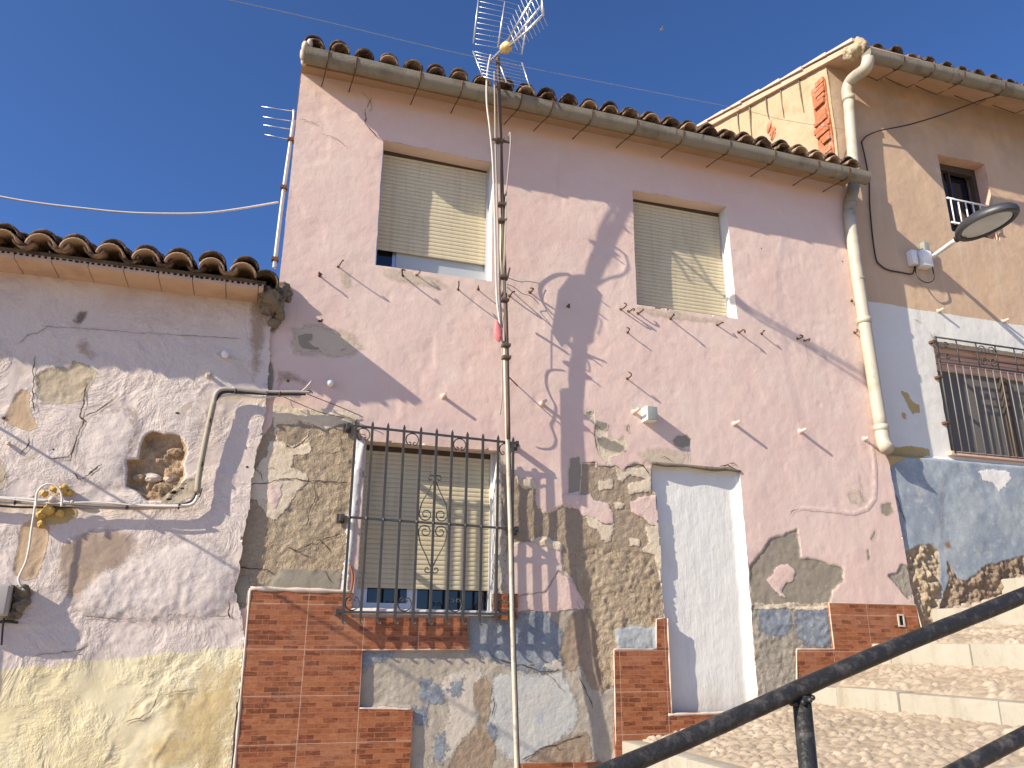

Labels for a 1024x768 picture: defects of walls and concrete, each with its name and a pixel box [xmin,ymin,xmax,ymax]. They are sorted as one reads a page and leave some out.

peeling [3,361,97,431]
crack [50,385,114,480]
crack [19,325,243,411]
flaking render [126,432,198,504]
flaking render [234,403,362,609]
crack [252,468,348,583]
flaking render [295,333,324,351]
peeling [901,391,920,419]
peeling [360,410,741,768]
flaking render [749,528,845,697]
flaking render [887,544,1024,628]